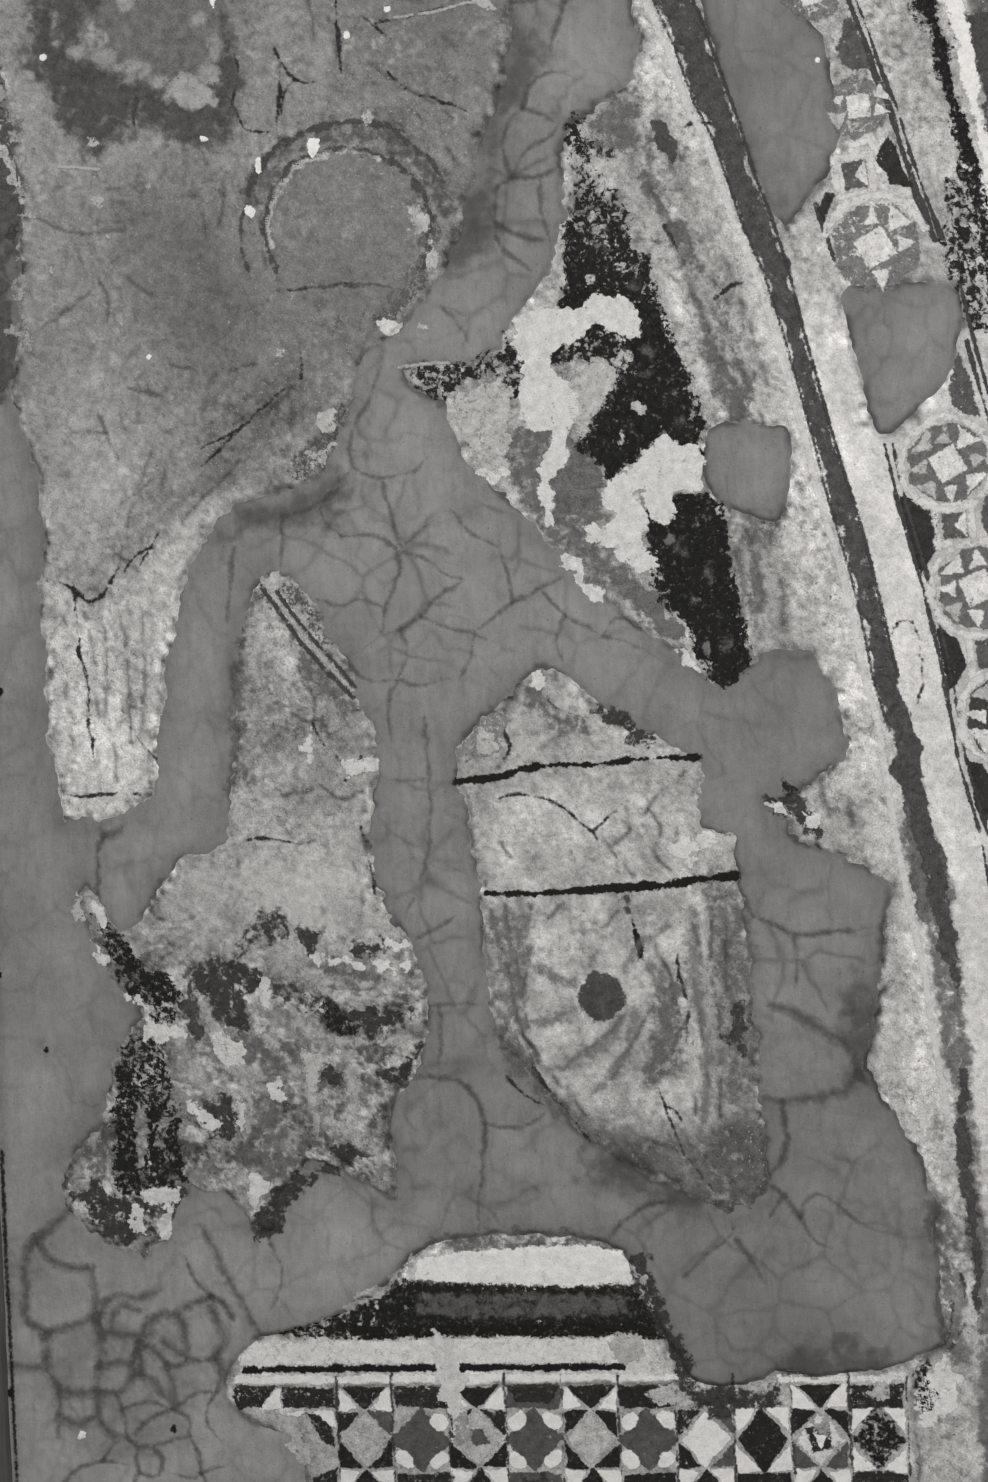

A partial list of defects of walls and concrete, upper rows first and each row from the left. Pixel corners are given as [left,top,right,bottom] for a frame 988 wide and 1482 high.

crack [228,0,470,133]
spalling [840,221,988,434]
crack [201,353,303,462]
spalling [702,420,792,522]
crack [47,533,158,760]
crack [73,791,138,799]
crack [499,792,622,840]
peeling [191,957,405,1129]
peeling [69,1143,150,1247]
crack [0,1150,232,1482]
peeling [402,1328,473,1446]
peeling [595,1329,683,1406]